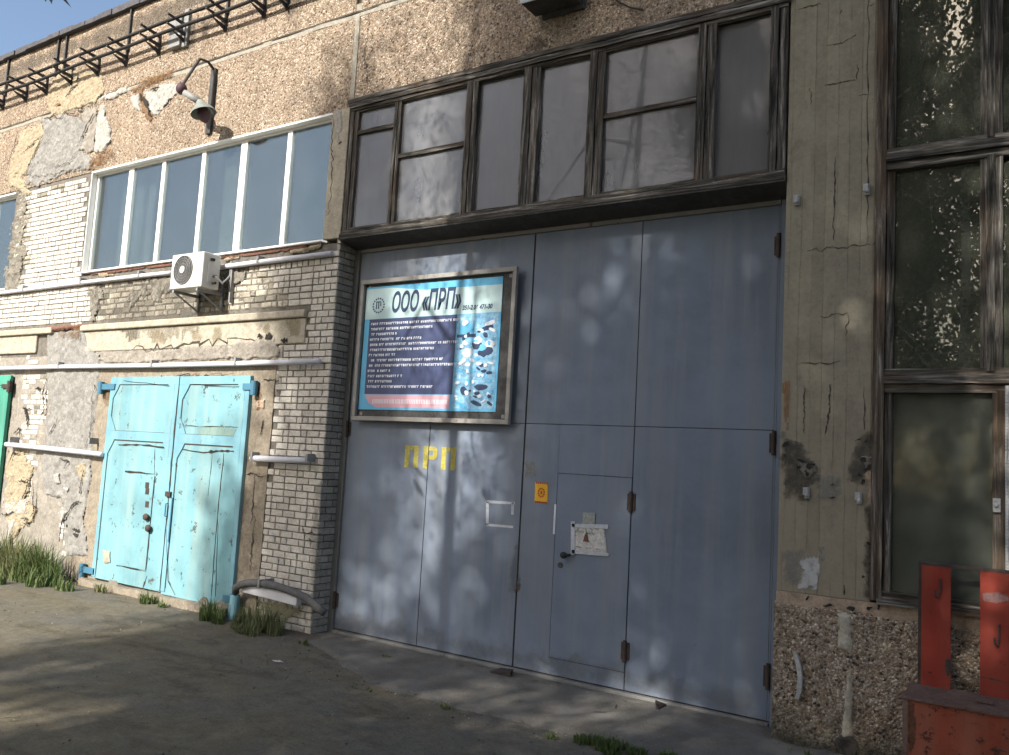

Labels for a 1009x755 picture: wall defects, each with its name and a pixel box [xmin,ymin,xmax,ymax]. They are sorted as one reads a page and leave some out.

crack [807,0,875,252]
spalling [3,67,181,295]
spalling [128,276,171,311]
spalling [220,271,245,286]
crack [803,361,839,433]
spalling [0,449,37,545]
spalling [53,458,86,542]
spalling [781,441,838,500]
spalling [848,434,872,504]